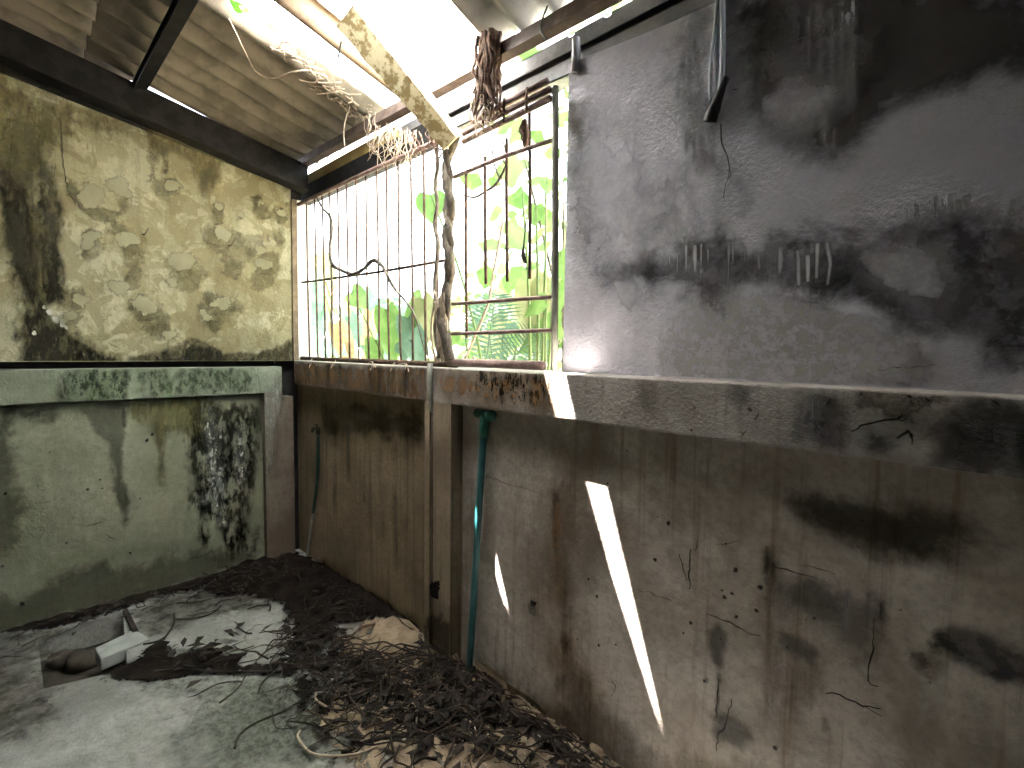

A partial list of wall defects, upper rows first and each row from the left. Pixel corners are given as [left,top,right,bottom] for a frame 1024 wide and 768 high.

water stain [735,0,1024,160]
peeling [69,176,177,342]
peeling [165,252,243,331]
water stain [0,85,426,441]
peeling [203,196,288,288]
water stain [601,194,1024,372]
rust [436,373,559,414]
crack [851,416,913,445]
water stain [0,385,280,632]
water stain [789,493,965,561]
crack [715,678,732,751]
crack [825,603,882,716]